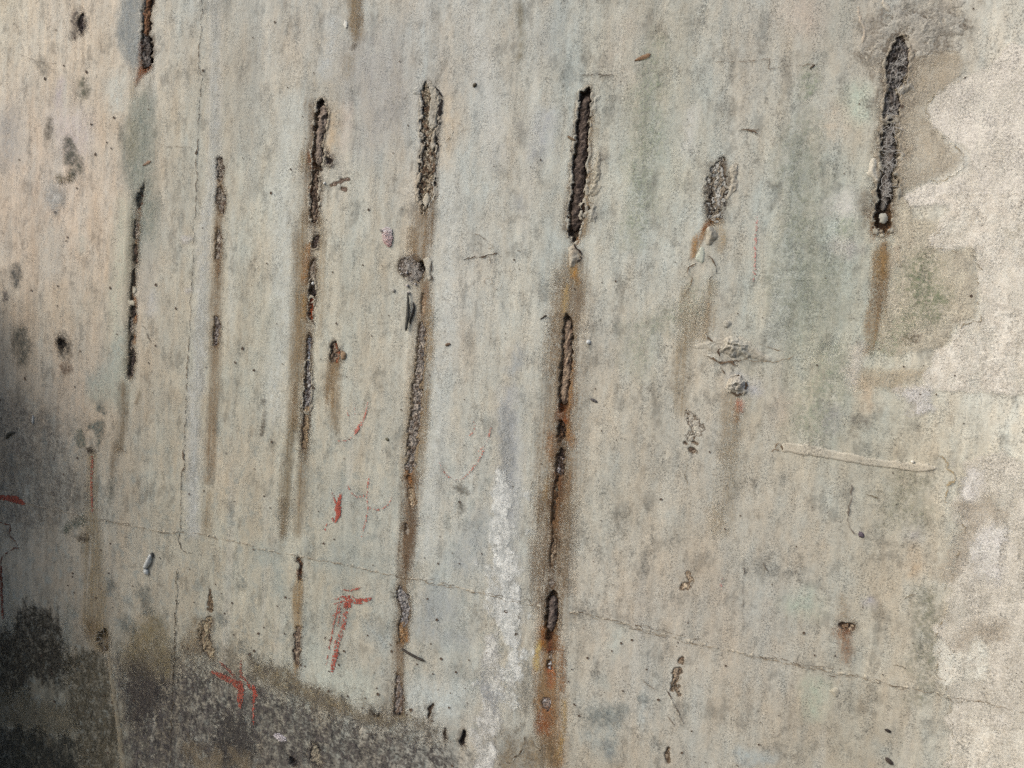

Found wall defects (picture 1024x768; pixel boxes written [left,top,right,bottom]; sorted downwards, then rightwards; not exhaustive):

spalling [141,0,155,71]
spalling [128,183,145,377]
crack [25,0,559,612]
spalling [301,100,350,450]
spalling [568,88,592,242]
rust [860,194,893,347]
peeling [873,36,1024,414]
rust [395,279,432,702]
rust [533,254,586,768]
crack [169,569,179,768]
leakage [0,582,460,768]
crack [569,610,1021,713]